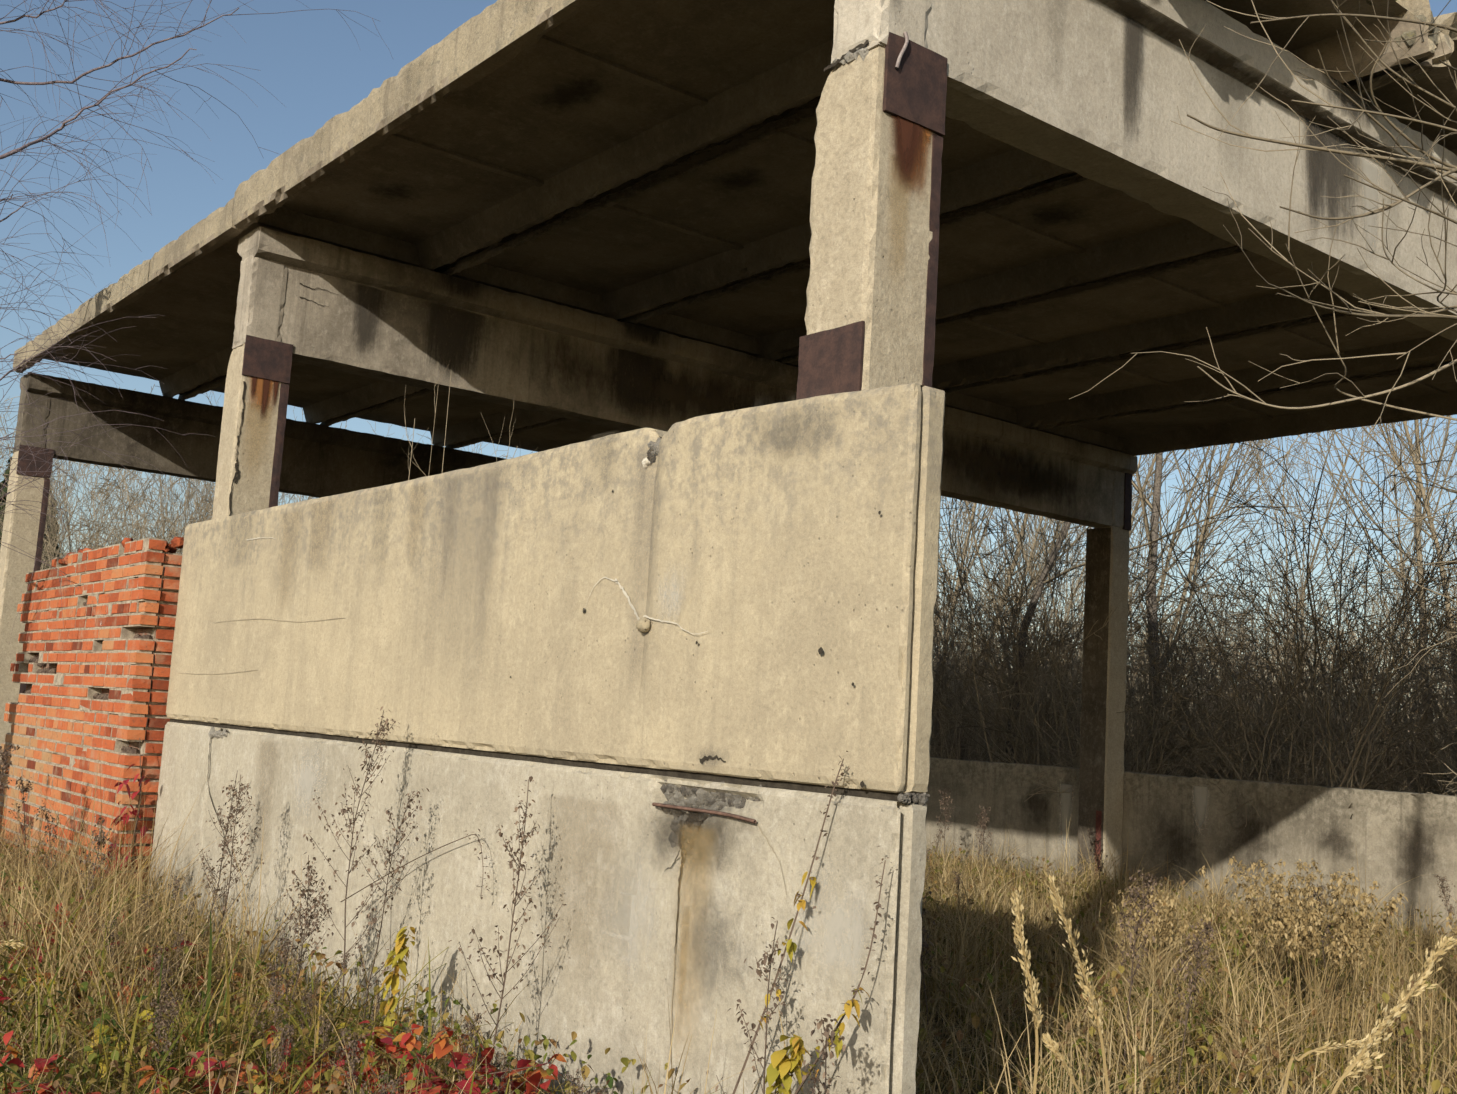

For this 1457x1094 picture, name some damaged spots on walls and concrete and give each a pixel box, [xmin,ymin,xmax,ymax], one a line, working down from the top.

damp [1125,17,1143,123]
spalling [1394,11,1440,81]
corrosion [895,115,931,184]
damp [1308,120,1378,244]
damp [355,285,383,344]
damp [427,273,483,369]
corrosion [251,376,279,415]
spalling [652,780,763,860]
damp [1325,834,1348,855]
damp [1403,830,1430,877]